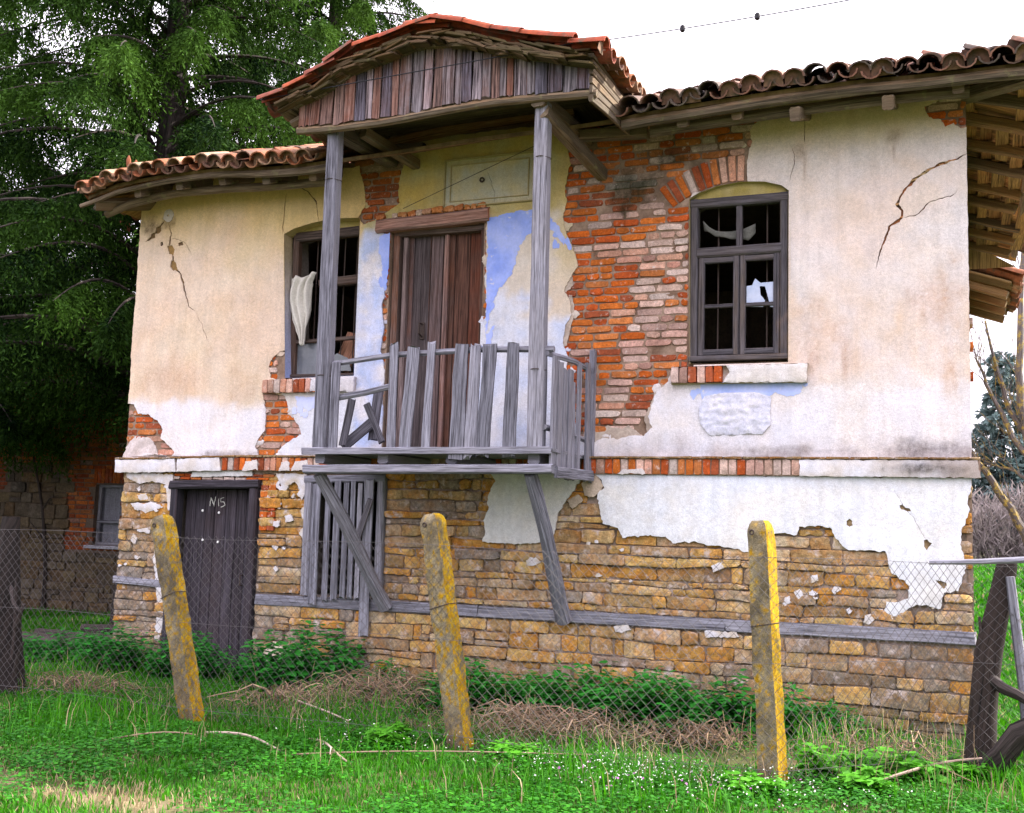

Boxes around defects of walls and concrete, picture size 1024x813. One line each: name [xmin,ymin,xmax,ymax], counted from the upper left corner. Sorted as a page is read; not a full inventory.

crack [149,227,184,282]
flaking render [351,155,404,224]
peeling [478,210,532,346]
flaking render [550,116,756,442]
crack [877,153,969,263]
flaking render [116,472,175,641]
flaking render [123,404,176,458]
flaking render [222,393,327,594]
flaking render [383,474,553,609]
flaking render [554,459,800,638]
flaking render [775,525,974,632]
flaking render [960,512,973,569]